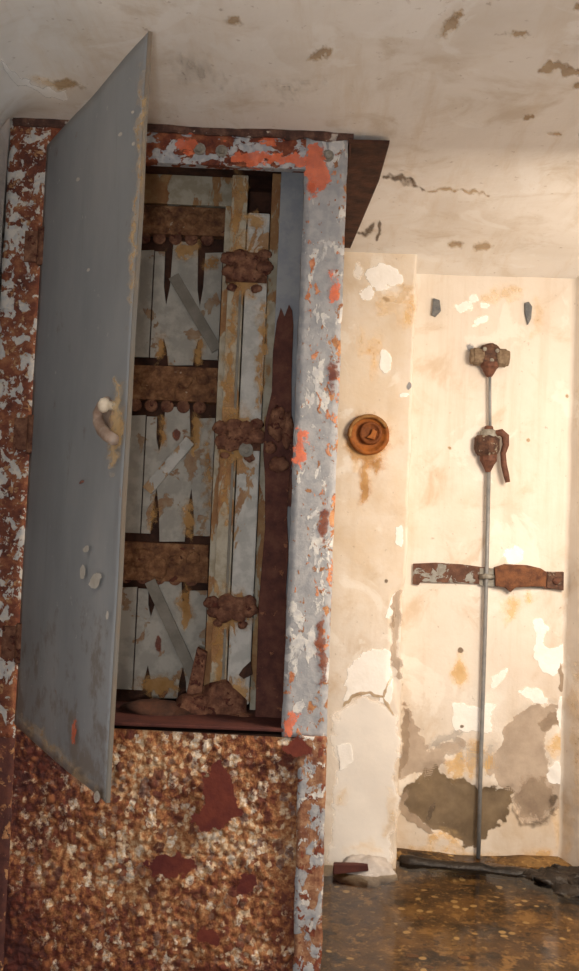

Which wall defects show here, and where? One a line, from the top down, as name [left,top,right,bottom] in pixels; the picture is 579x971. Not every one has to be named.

crack [382,173,489,197]
rust [345,434,389,503]
peeling [395,525,403,547]
crack [343,679,394,715]
flaking render [343,590,564,848]